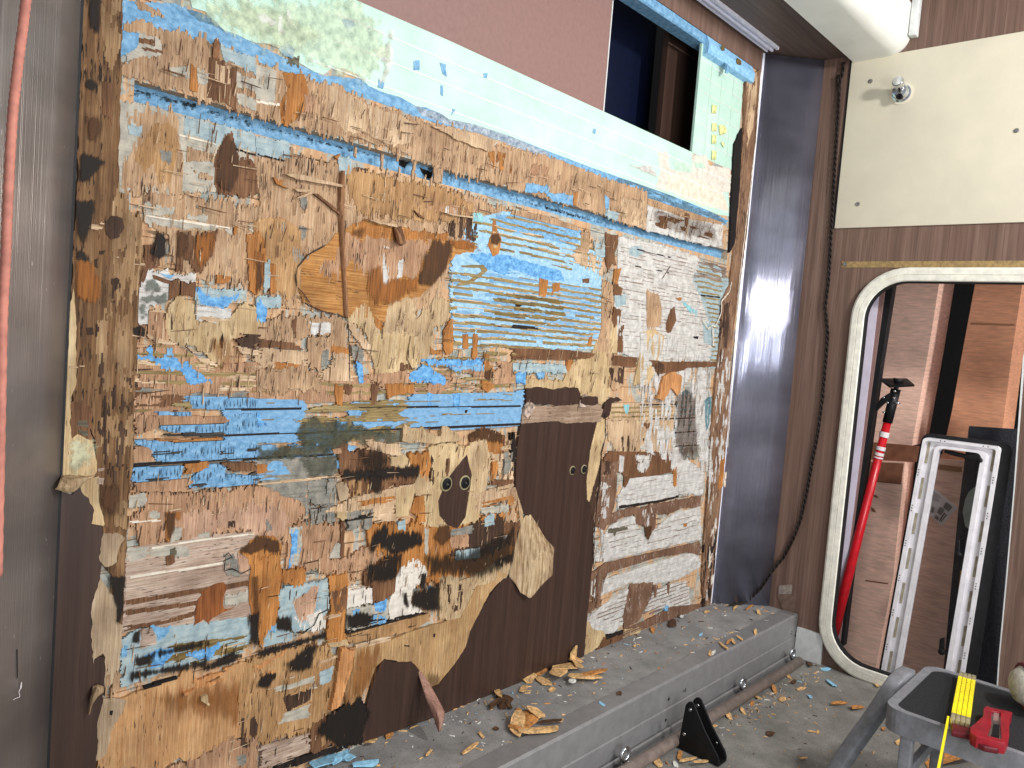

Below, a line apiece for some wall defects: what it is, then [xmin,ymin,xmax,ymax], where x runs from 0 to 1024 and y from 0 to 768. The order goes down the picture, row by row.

peeling [139,38,163,54]
peeling [189,39,237,112]
peeling [279,72,416,148]
peeling [132,122,214,185]
peeling [252,216,302,302]
peeling [320,165,474,285]
peeling [133,263,196,341]
peeling [254,317,349,399]
peeling [371,316,418,374]
peeling [509,151,731,650]
peeling [99,499,289,633]
peeling [418,671,445,732]